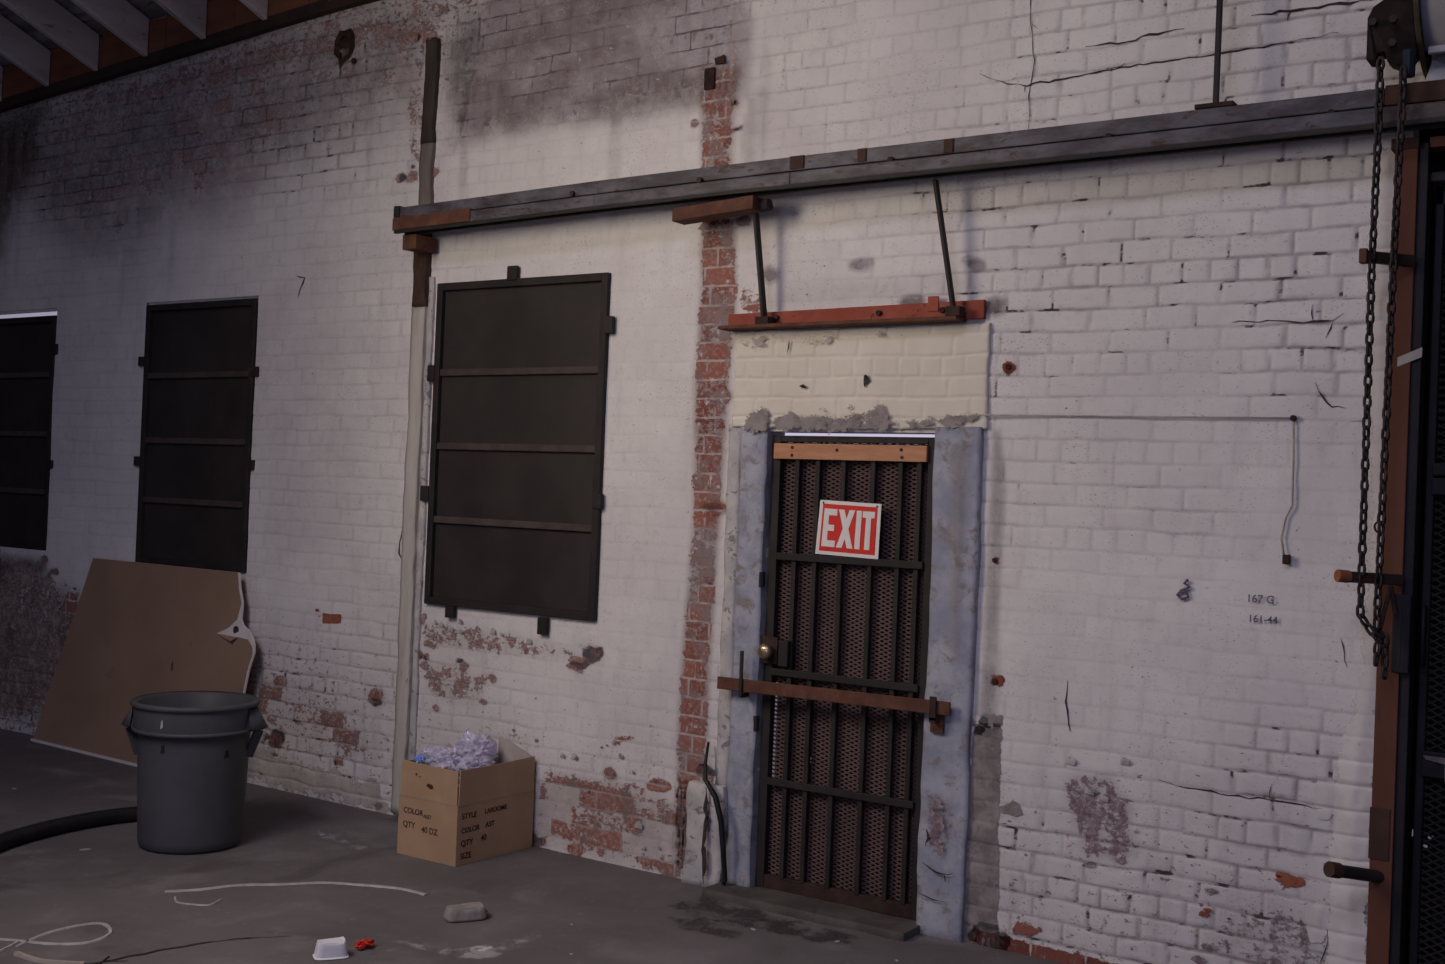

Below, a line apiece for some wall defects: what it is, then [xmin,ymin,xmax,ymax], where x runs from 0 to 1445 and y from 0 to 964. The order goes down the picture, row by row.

damp [449,0,746,137]
crack [981,0,1371,128]
peeling [851,259,869,269]
peeling [986,299,1001,312]
spalling [744,404,978,435]
flaking render [532,215,760,877]
peeling [419,613,601,711]
peeling [1065,756,1138,868]
flaking render [1198,888,1218,918]
flaking render [969,921,1114,964]
peeling [1191,904,1317,964]